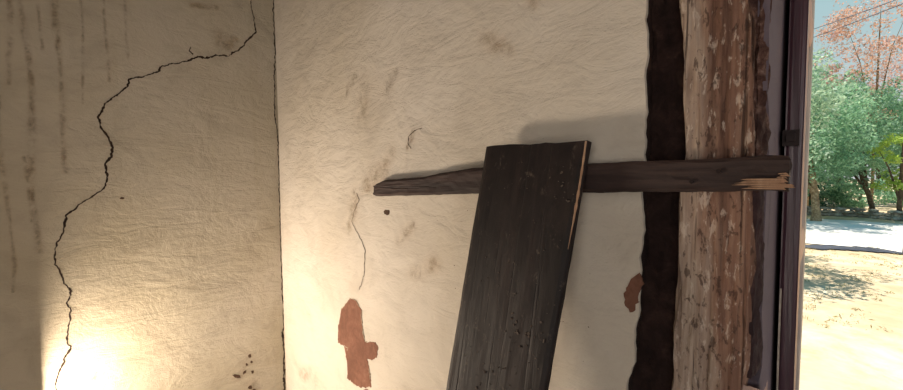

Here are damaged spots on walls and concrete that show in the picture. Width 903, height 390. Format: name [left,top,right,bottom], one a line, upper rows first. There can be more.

crack [53,0,286,390]
peeling [624,273,644,312]
peeling [338,298,378,390]